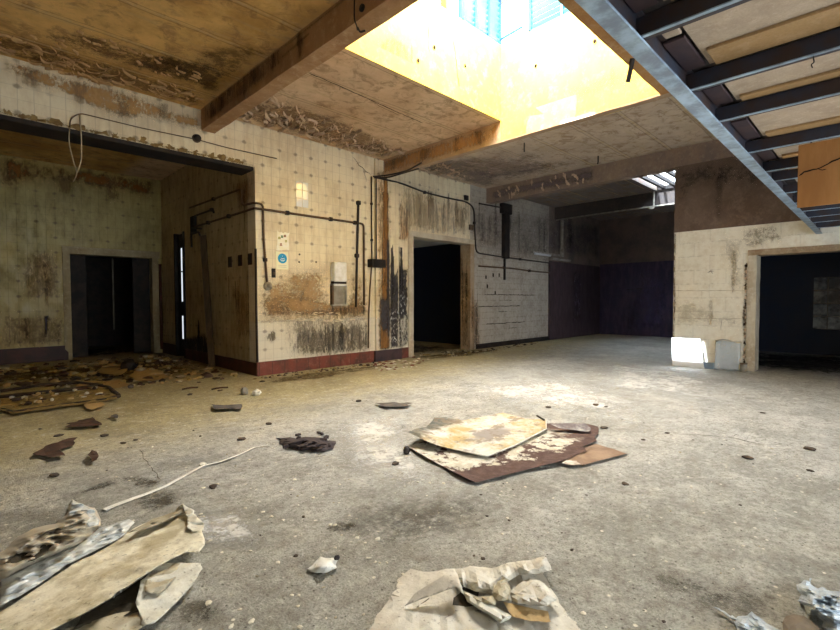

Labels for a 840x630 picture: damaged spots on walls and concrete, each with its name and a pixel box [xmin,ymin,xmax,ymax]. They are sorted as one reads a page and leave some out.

peeling [0,30,203,105]
spalling [2,109,253,166]
peeling [239,96,405,157]
damp [3,160,152,198]
peeling [420,160,592,199]
crack [799,158,840,176]
damp [404,192,469,232]
damp [390,245,403,312]
damp [265,273,366,354]